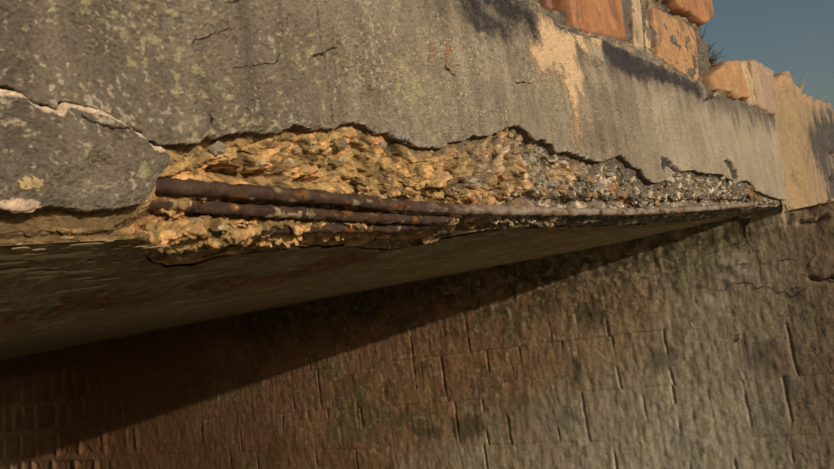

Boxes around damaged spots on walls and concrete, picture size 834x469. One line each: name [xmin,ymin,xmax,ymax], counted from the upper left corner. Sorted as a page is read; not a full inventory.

spalling [0,89,782,295]
crack [701,239,834,297]
leakage [545,347,767,469]